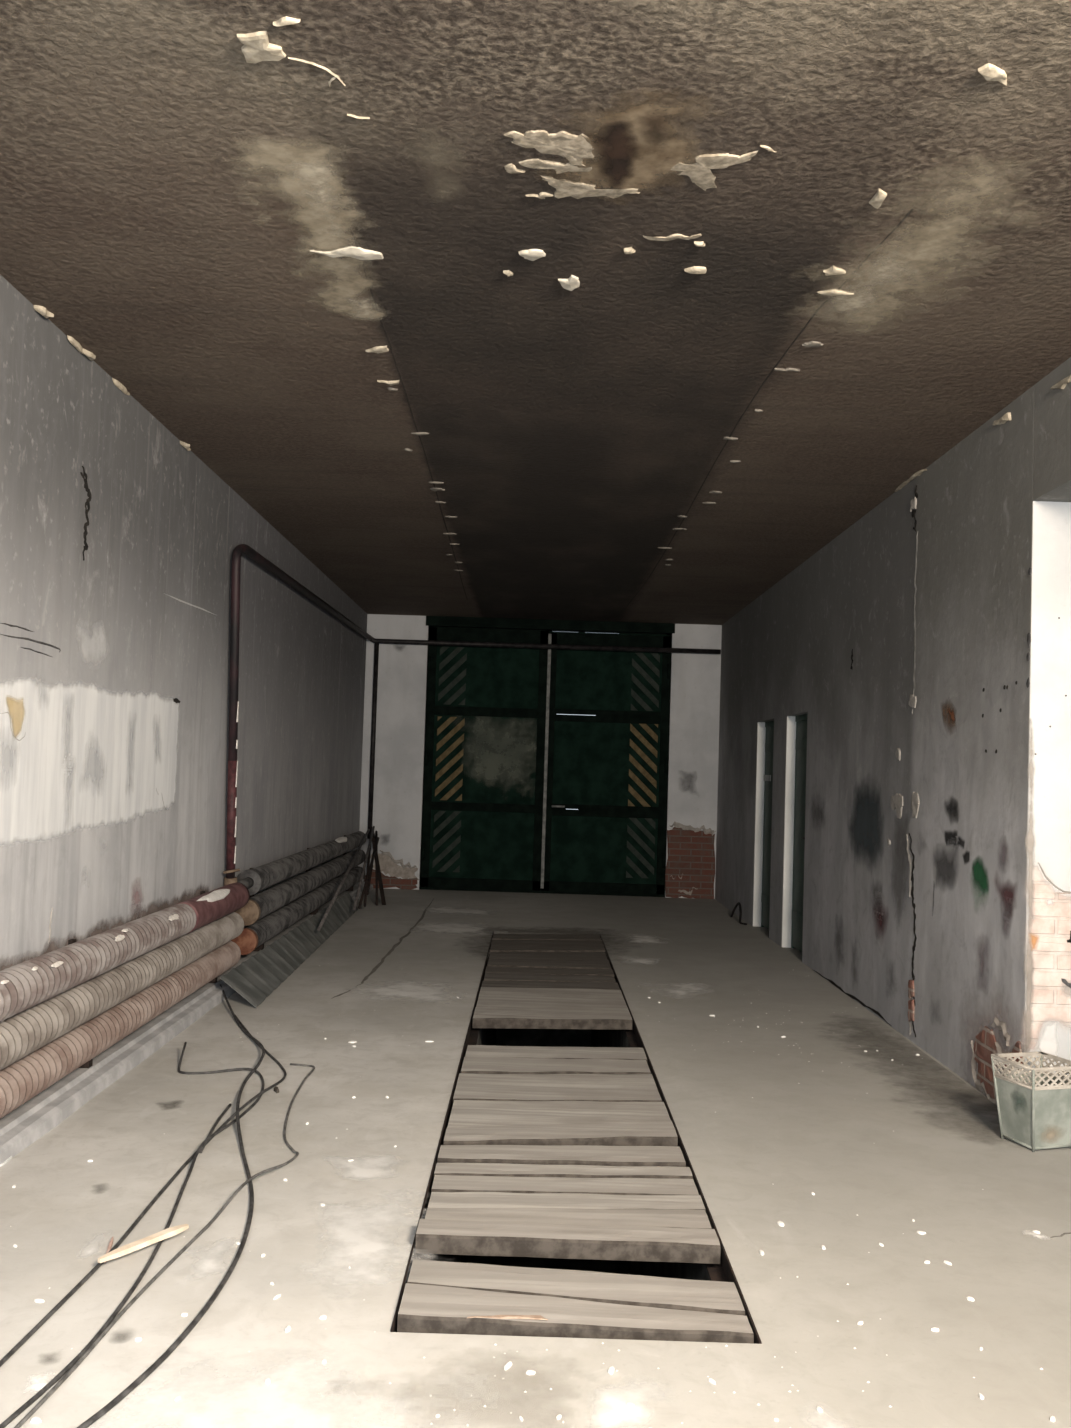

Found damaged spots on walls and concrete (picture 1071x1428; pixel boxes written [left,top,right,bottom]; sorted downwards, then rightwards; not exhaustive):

peeling [237,16,300,64]
flaking render [504,92,777,199]
water stain [241,140,383,318]
flaking render [624,234,705,254]
water stain [835,158,1018,331]
crack [80,466,92,561]
crack [910,485,918,714]
flaking render [665,821,716,899]
peeling [971,864,1071,1105]